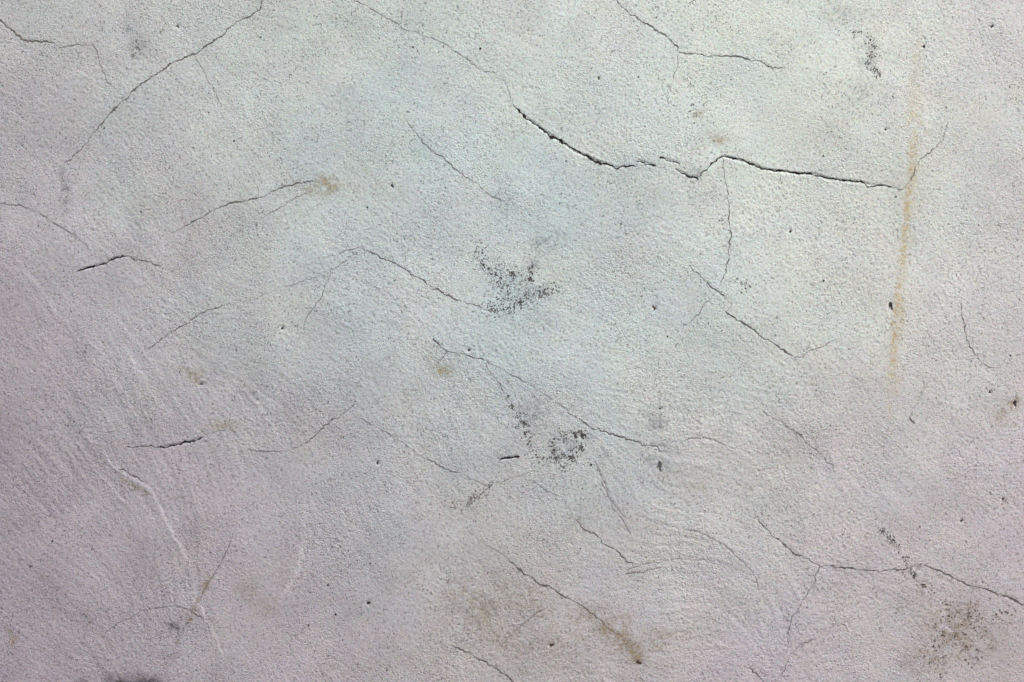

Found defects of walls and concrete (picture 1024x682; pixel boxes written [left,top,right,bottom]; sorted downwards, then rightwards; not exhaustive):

crack [0,2,262,184]
crack [3,202,160,272]
crack [174,180,313,232]
crack [358,1,948,358]
crack [147,247,501,351]
crack [75,426,226,482]
crack [749,518,1024,682]